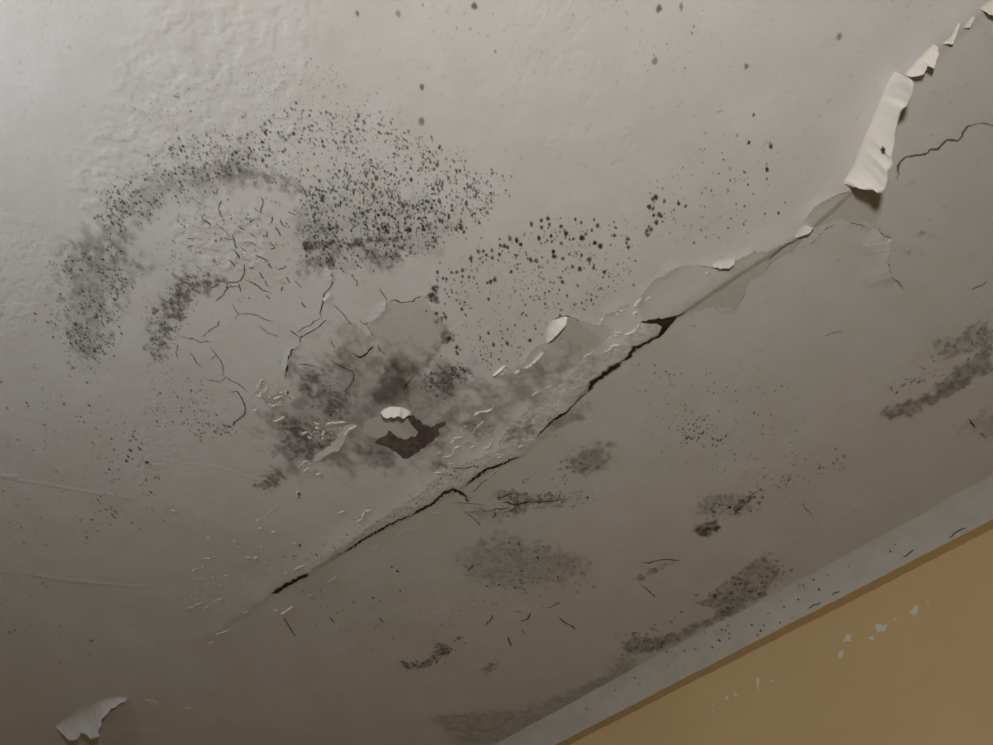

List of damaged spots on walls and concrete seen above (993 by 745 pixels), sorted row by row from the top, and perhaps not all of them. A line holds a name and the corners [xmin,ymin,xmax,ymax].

crack [897,126,969,173]
water stain [155,118,494,269]
water stain [636,193,687,237]
peeling [493,0,993,396]
crack [172,188,421,427]
peeling [355,298,460,377]
water stain [428,217,636,325]
peeling [253,339,300,421]
spalling [294,406,446,475]
peeling [434,405,501,480]
peeling [55,696,127,742]